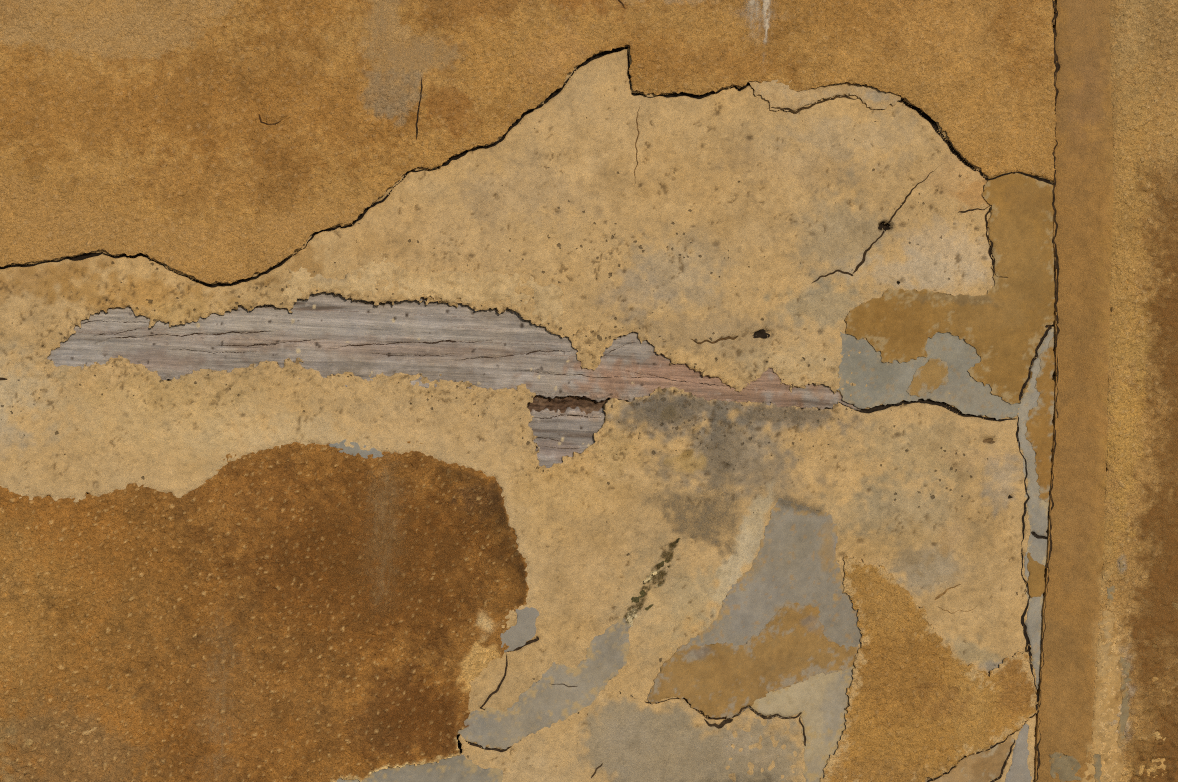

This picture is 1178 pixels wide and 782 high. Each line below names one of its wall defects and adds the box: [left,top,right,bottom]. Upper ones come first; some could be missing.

damp [750,0,770,42]
crack [769,95,860,114]
crack [812,164,942,283]
crack [692,336,738,344]
peeling [837,332,1020,420]
crack [927,0,1060,782]
peeling [1018,322,1055,689]
peeling [647,498,862,730]
peeling [458,617,631,750]
flaking render [572,665,856,782]
crack [704,705,806,746]
peeling [989,714,1036,782]